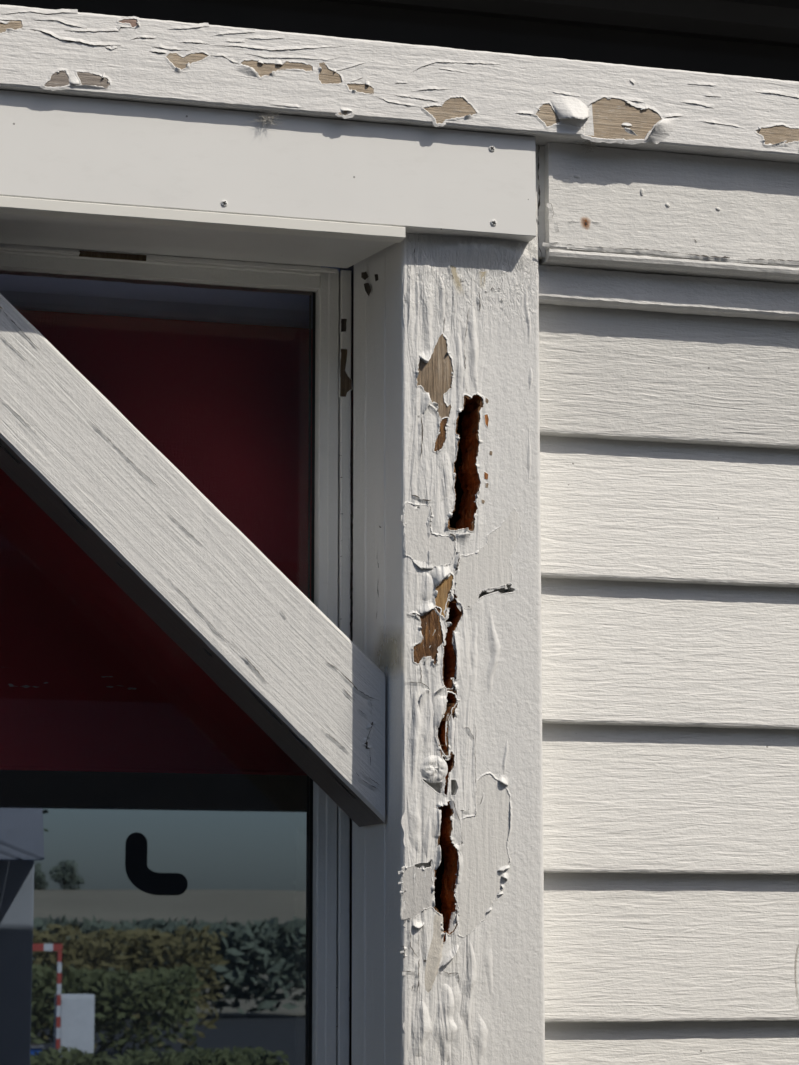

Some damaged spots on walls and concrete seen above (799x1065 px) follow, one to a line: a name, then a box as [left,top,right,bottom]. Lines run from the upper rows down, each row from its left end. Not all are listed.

peeling [0,18,23,34]
peeling [115,16,141,29]
peeling [163,50,211,74]
peeling [40,67,113,91]
peeling [234,57,375,95]
peeling [335,107,354,119]
peeling [420,95,479,127]
peeling [532,95,679,145]
peeling [754,122,799,149]
peeling [398,333,522,993]